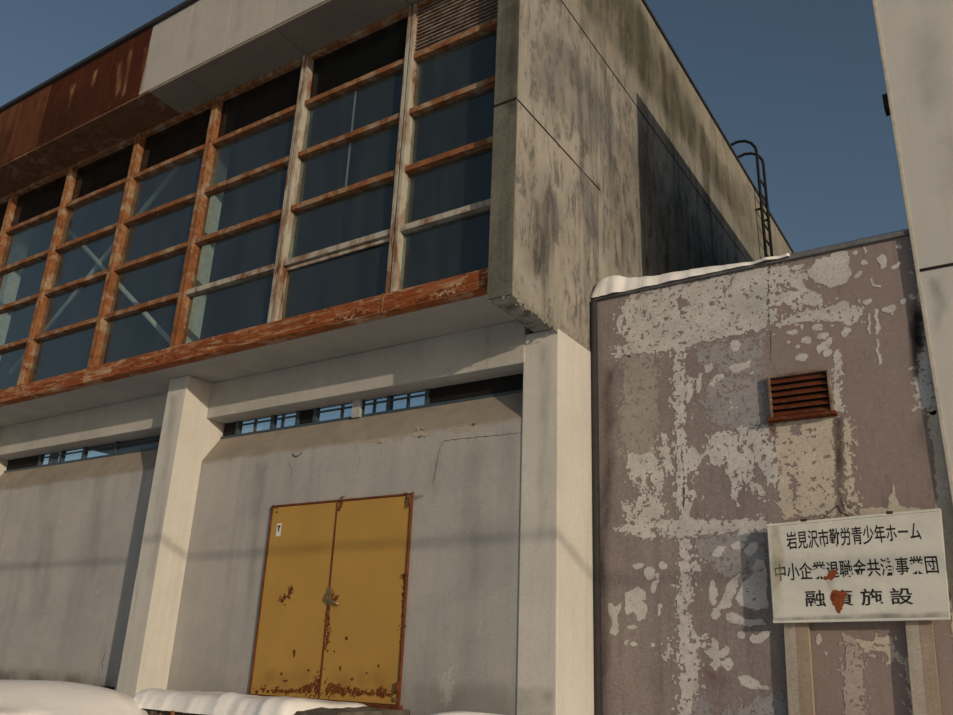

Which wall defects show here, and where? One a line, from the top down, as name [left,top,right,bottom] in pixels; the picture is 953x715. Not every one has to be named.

water stain [606,0,705,147]
corrosion [109,269,488,376]
crack [433,433,517,481]
peeling [608,246,953,715]
corrosion [324,590,340,652]
corrosion [253,668,395,699]